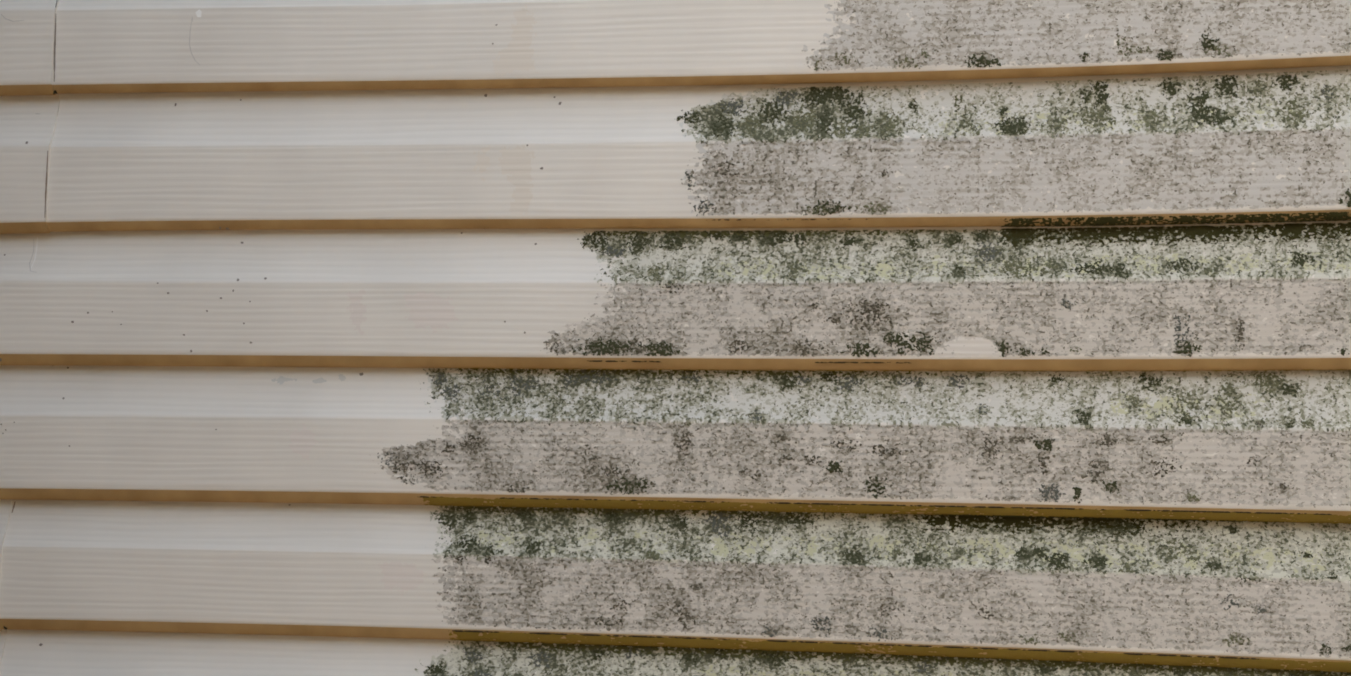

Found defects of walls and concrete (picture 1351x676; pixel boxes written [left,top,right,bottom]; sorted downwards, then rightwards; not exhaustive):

crack [51,0,59,82]
leakage [374,0,1351,676]